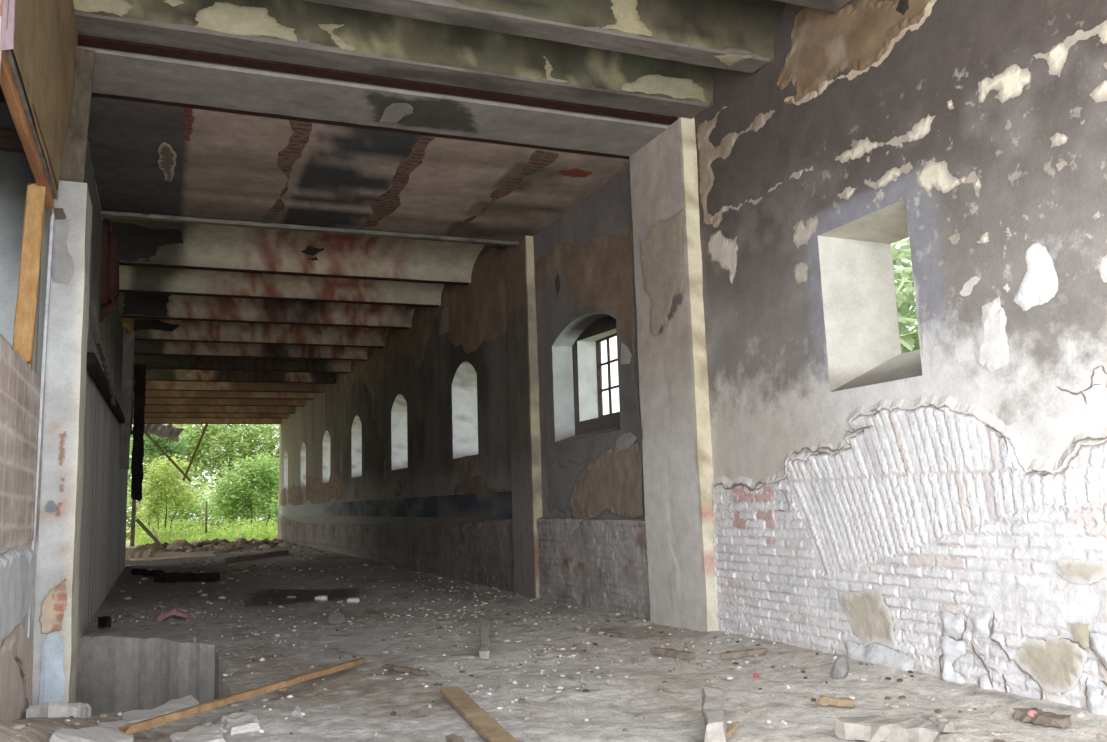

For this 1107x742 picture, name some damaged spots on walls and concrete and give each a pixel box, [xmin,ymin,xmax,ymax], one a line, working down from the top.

flaking render [195,2,298,42]
flaking render [602,0,653,36]
flaking render [621,75,706,102]
peeling [978,20,1107,103]
flaking render [697,0,937,285]
peeling [837,160,982,200]
peeling [975,242,1059,374]
crack [1057,366,1107,404]
flaking render [536,432,651,620]
flaking render [713,395,1107,709]
flaking render [0,622,32,721]
spalling [75,636,238,715]